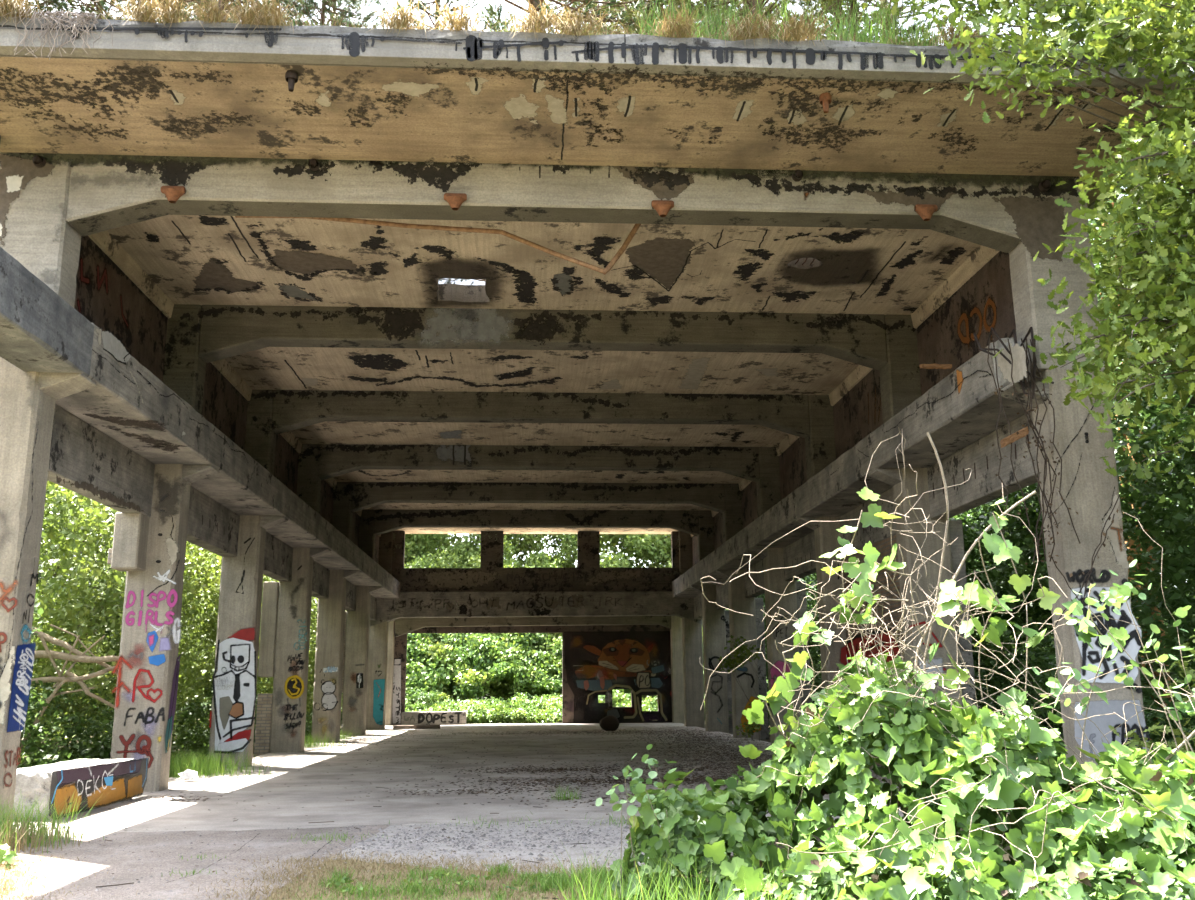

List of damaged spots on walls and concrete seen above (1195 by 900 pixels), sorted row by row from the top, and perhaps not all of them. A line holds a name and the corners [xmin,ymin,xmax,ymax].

damp [341,32,384,57]
damp [455,35,521,62]
damp [0,152,449,185]
damp [498,163,601,171]
damp [620,166,1073,189]
peeling [512,267,584,304]
peeling [557,236,972,335]